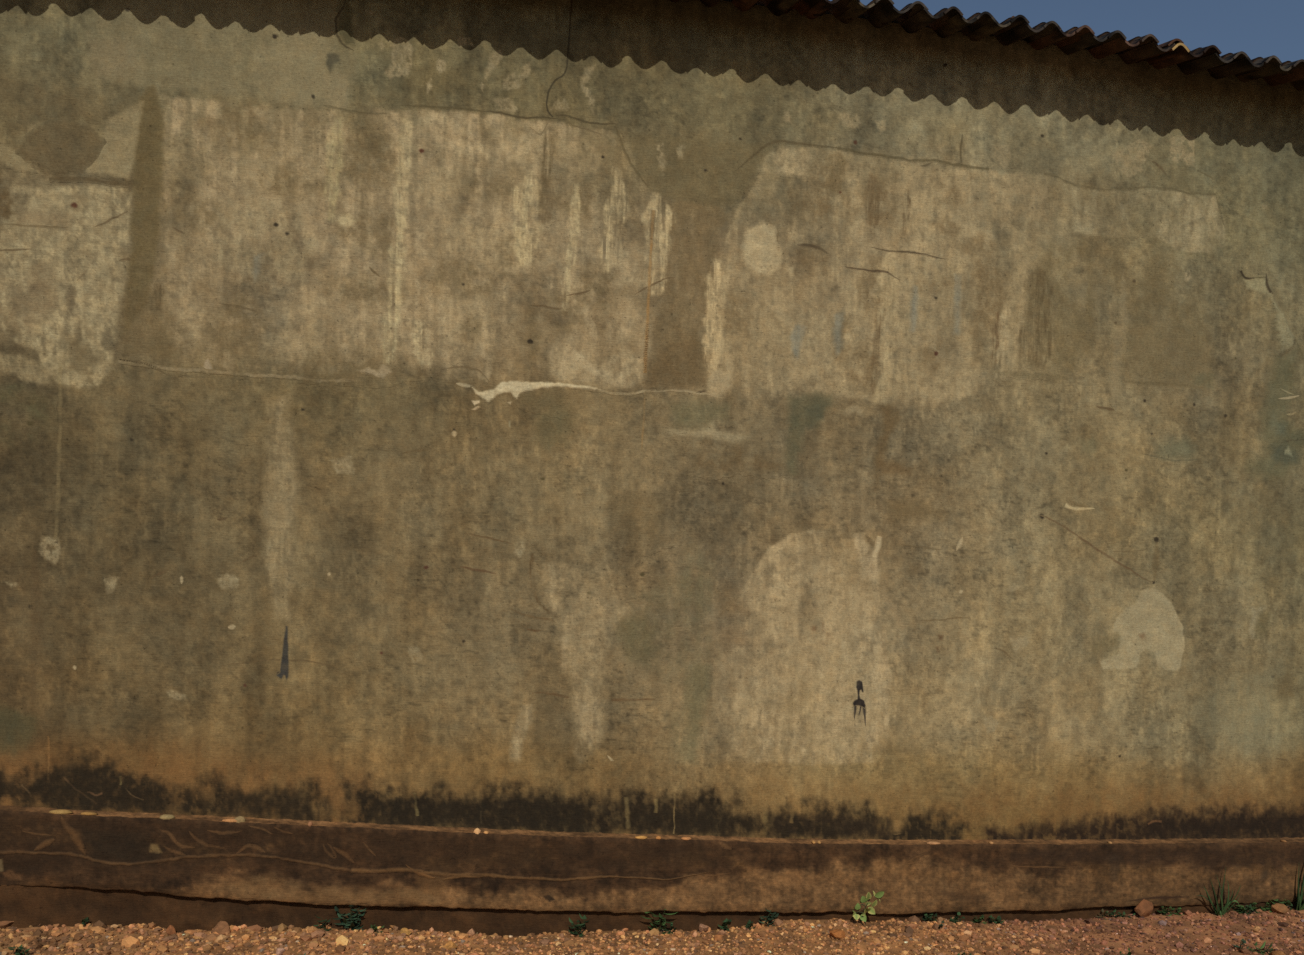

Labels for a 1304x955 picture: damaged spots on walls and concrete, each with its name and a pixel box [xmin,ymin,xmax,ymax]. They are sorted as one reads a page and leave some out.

peeling [0,18,667,428]
crack [323,0,650,189]
leakage [508,119,735,397]
crack [735,134,989,171]
leakage [507,699,538,748]
leakage [601,479,724,760]
leakage [1086,627,1124,662]
leakage [1179,655,1299,767]
leakage [0,736,1304,884]